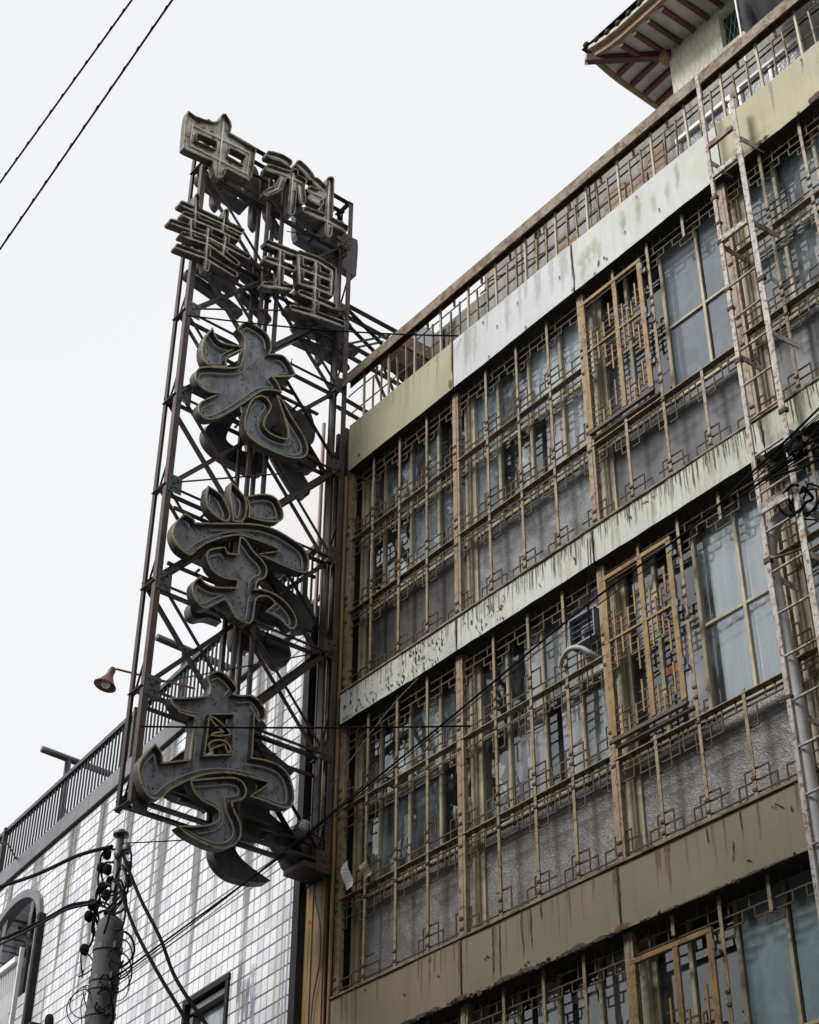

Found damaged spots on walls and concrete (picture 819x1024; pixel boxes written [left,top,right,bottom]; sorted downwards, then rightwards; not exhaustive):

damp [567,181,599,232]
damp [514,223,548,284]
damp [349,419,765,697]
peeling [343,630,443,720]
corrosion [400,932,616,1024]